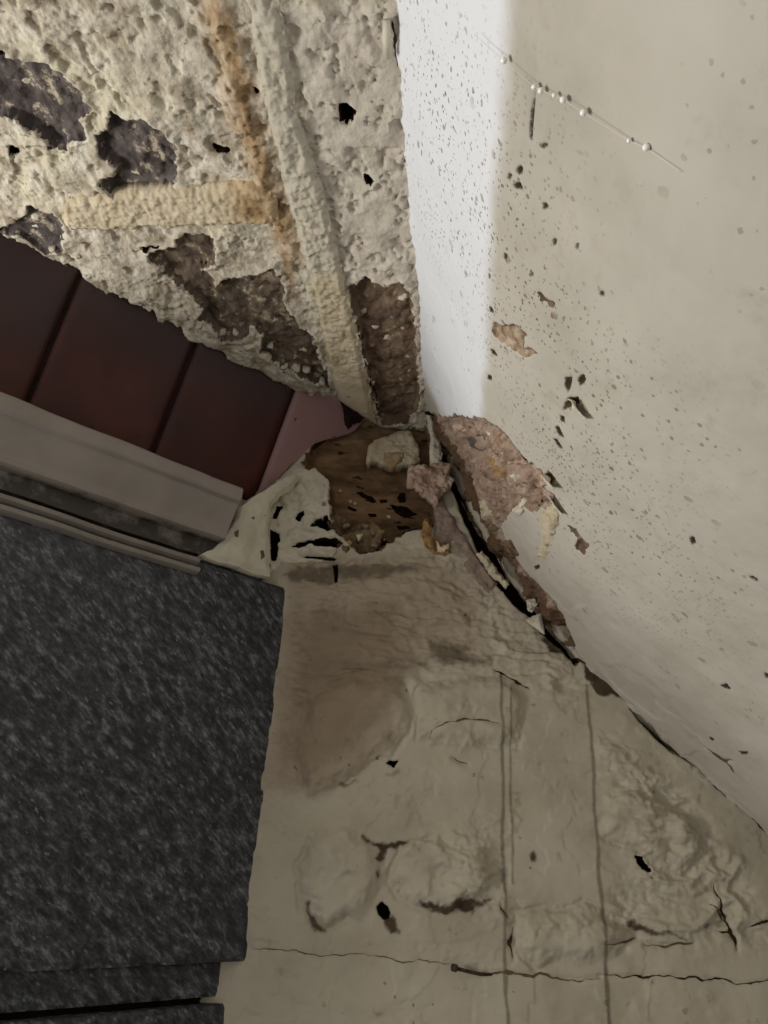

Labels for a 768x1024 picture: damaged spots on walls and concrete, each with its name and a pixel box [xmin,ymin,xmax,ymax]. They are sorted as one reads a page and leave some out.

flaking render [0,50,177,197]
rust [221,23,284,238]
flaking render [148,233,364,429]
flaking render [347,276,577,652]
spalling [251,466,343,572]
water stain [582,661,620,697]
water stain [362,836,406,877]
crack [259,948,442,964]
water stain [384,916,399,933]
water stain [421,898,491,915]
crack [492,906,768,985]
crack [710,884,768,950]